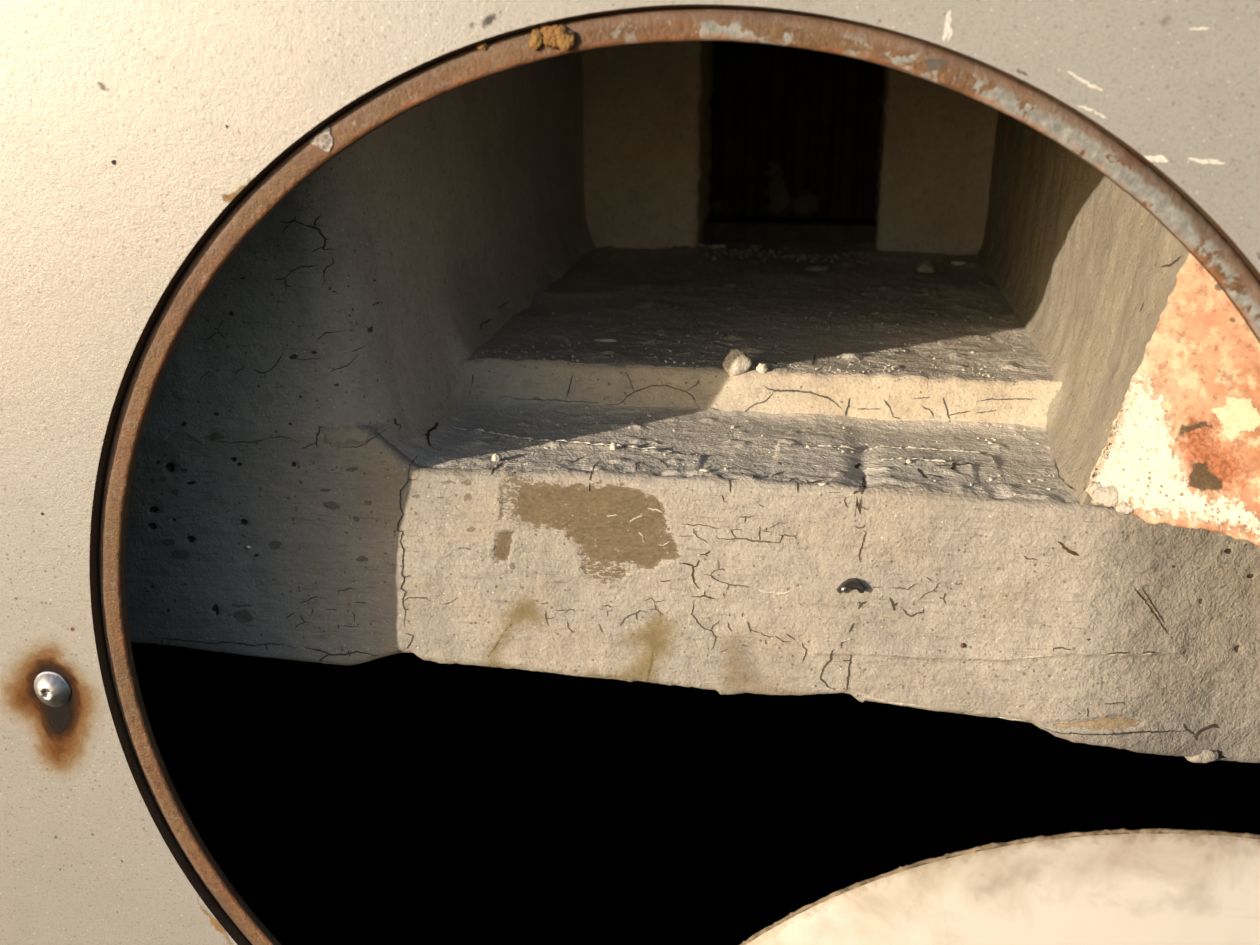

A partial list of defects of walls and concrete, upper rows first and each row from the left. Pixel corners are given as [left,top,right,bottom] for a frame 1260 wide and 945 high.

crack [201,215,379,378]
crack [506,354,1032,419]
crack [572,446,669,491]
rust [1174,405,1251,493]
crack [214,418,457,648]
crack [541,459,972,691]
crack [156,588,378,662]
damp [490,603,539,666]
damp [609,618,670,679]
rust [3,646,94,771]